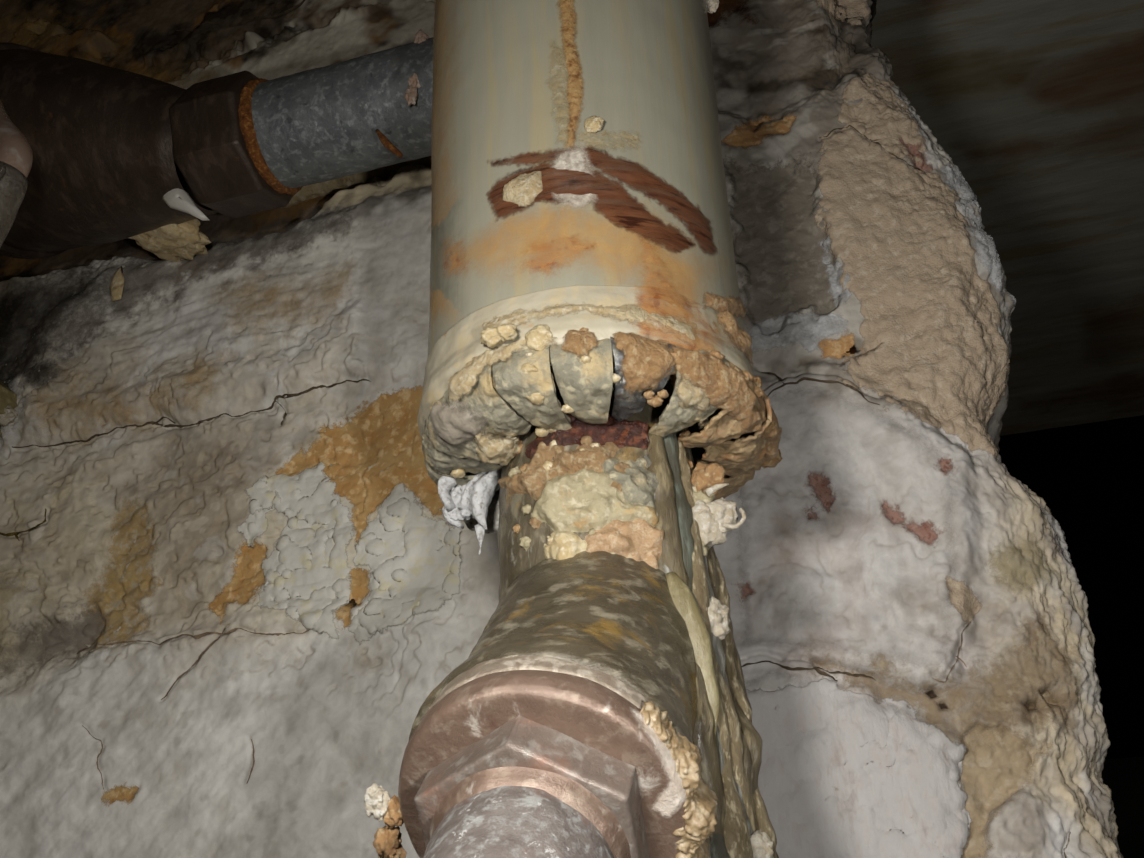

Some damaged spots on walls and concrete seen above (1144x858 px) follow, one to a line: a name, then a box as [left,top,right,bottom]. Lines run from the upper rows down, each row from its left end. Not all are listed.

rust [558,0,583,148]
rust [238,78,302,195]
crack [12,379,371,448]
rust [525,412,650,459]
crack [0,509,47,541]
peeling [209,386,462,644]
crack [77,628,313,700]
damp [812,617,1078,751]